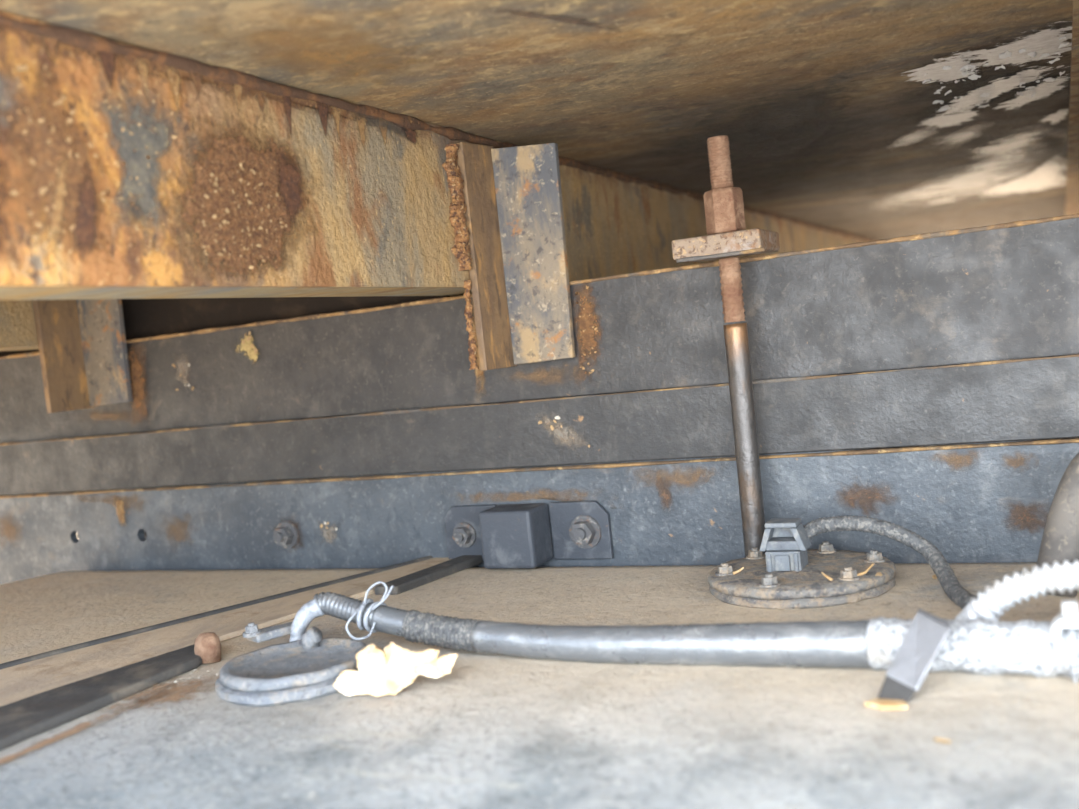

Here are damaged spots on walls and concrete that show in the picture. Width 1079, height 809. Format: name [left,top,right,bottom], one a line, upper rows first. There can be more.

rust [0,25,110,258]
rust [75,47,417,281]
peeling [882,21,1072,205]
peeling [237,331,260,361]
rust [0,144,729,446]
peeling [538,416,576,443]
rust [569,214,1079,376]
rust [752,354,1079,384]